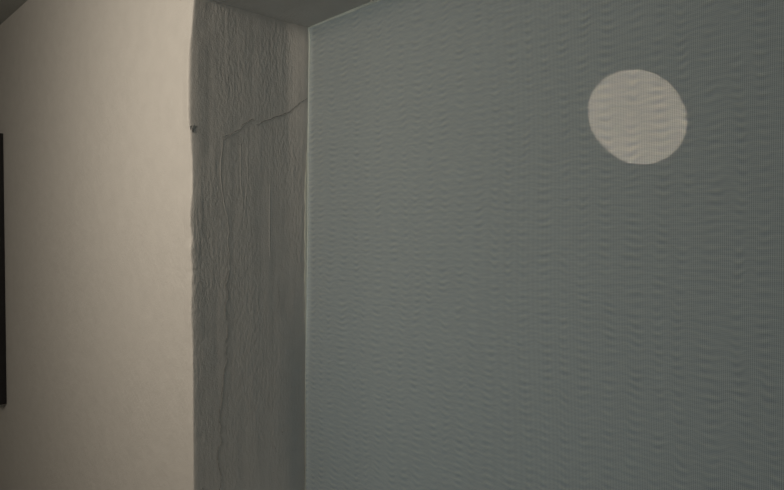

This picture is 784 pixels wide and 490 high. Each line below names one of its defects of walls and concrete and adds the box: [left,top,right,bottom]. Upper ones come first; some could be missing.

crack [217,98,308,490]